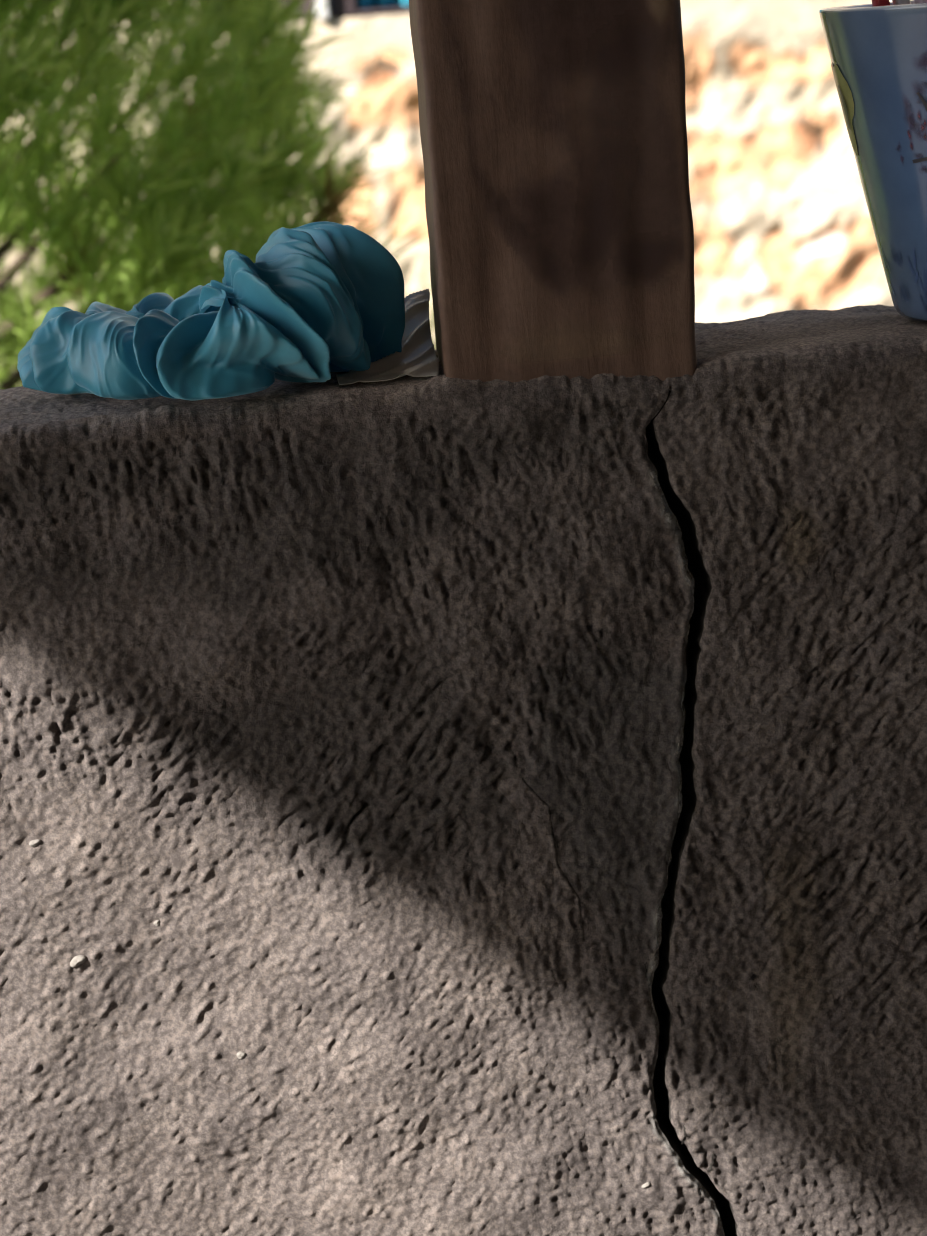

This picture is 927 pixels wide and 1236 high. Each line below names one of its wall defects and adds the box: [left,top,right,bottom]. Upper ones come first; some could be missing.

crack [644,390,738,1236]